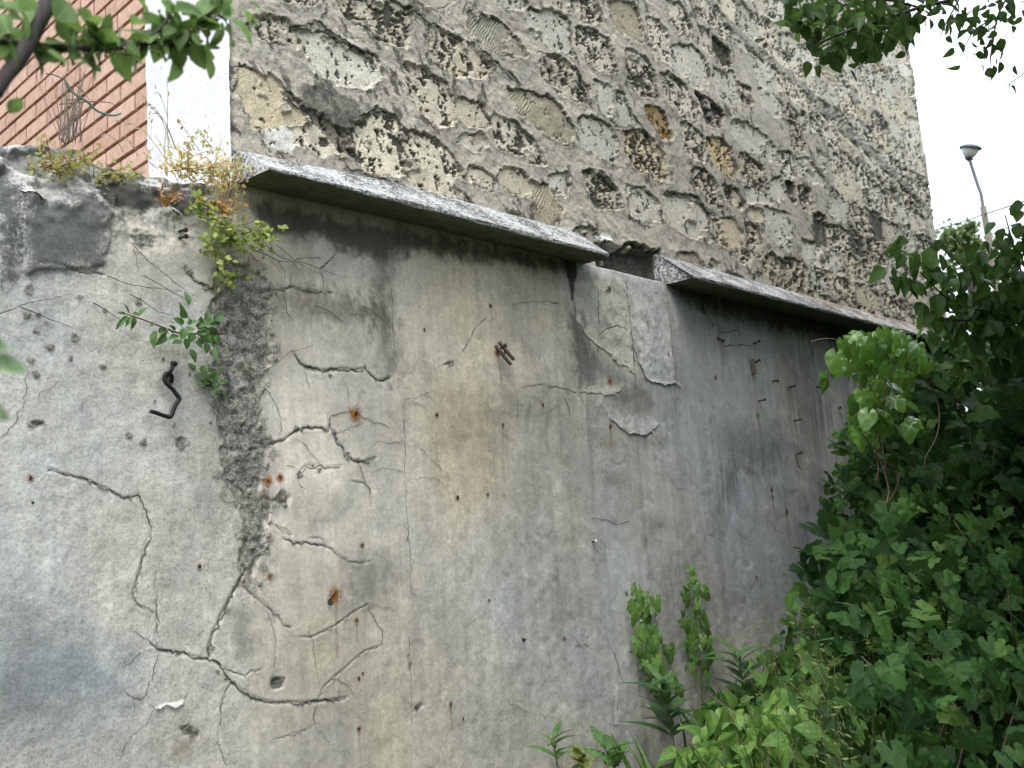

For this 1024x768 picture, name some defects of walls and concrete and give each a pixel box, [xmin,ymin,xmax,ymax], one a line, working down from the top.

flaking render [205,258,288,600]
crack [263,289,441,595]
leakage [256,202,577,299]
peeling [573,280,681,435]
leakage [672,287,867,342]
crack [52,471,412,766]